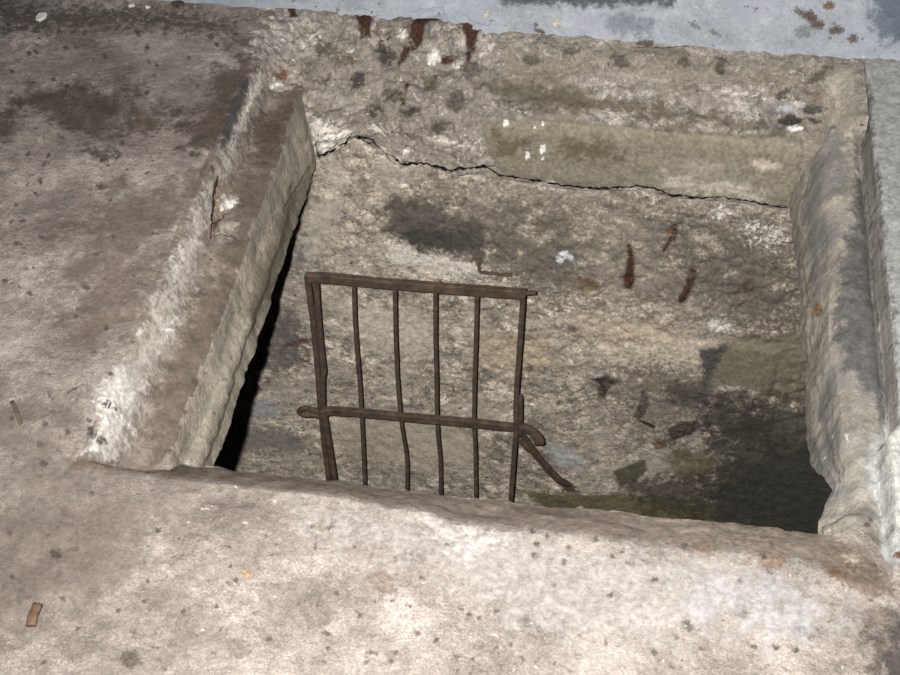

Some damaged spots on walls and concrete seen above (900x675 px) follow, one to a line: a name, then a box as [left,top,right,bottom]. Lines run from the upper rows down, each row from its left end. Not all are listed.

rust [356,15,379,38]
rust [398,18,440,65]
rust [463,23,480,61]
crack [282,135,787,213]
leakage [376,183,634,299]
rust [663,224,678,252]
rust [623,244,634,289]
rust [679,265,697,303]
leakage [567,159,832,536]
leakage [545,442,589,471]